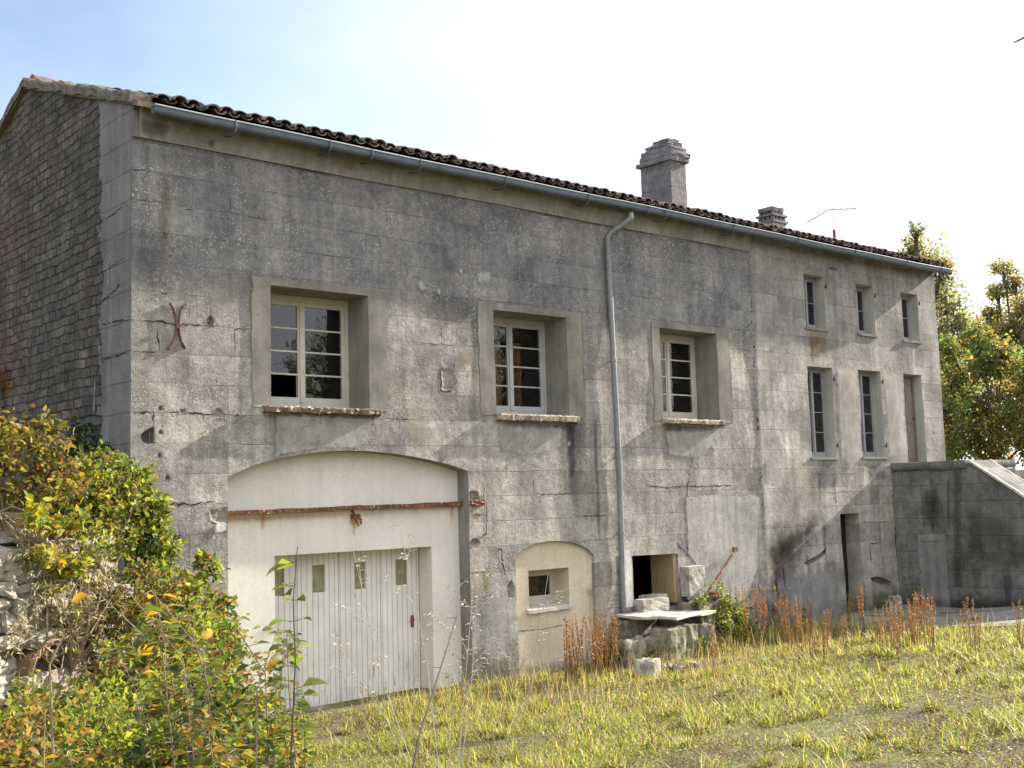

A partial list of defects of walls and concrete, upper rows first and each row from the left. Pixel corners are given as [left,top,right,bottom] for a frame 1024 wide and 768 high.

crack [100,259,246,361]
spalling [141,427,154,444]
crack [649,456,732,496]
crack [170,500,213,508]
crack [474,485,509,582]